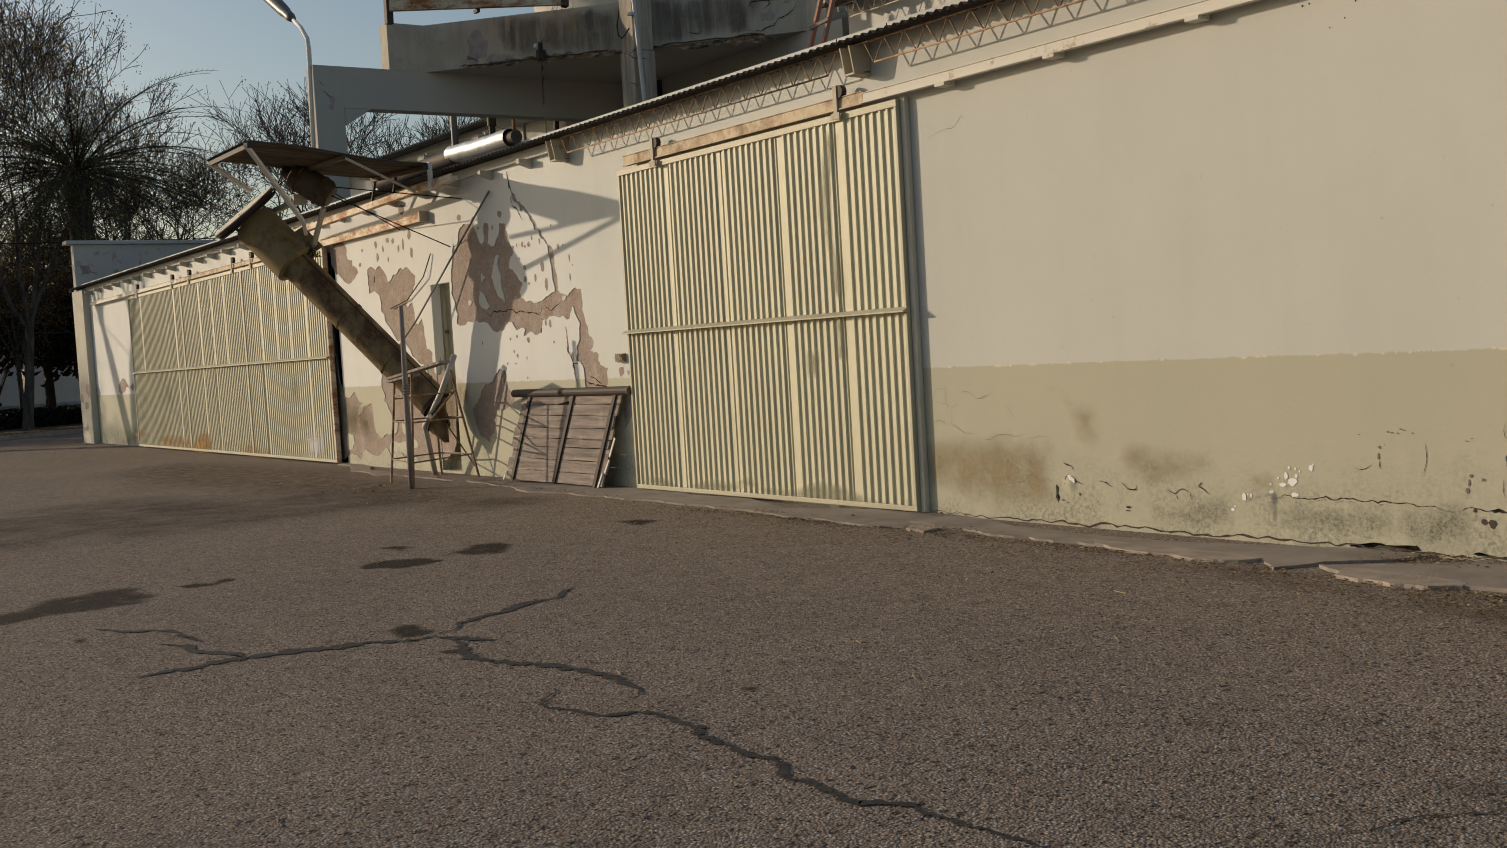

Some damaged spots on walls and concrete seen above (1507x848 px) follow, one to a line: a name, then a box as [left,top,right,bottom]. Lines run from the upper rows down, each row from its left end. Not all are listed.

peeling [331,205,456,461]
peeling [452,193,630,441]
peeling [597,396,632,488]
spalling [1231,464,1314,511]
crack [1275,446,1507,513]
spalling [1465,474,1506,529]